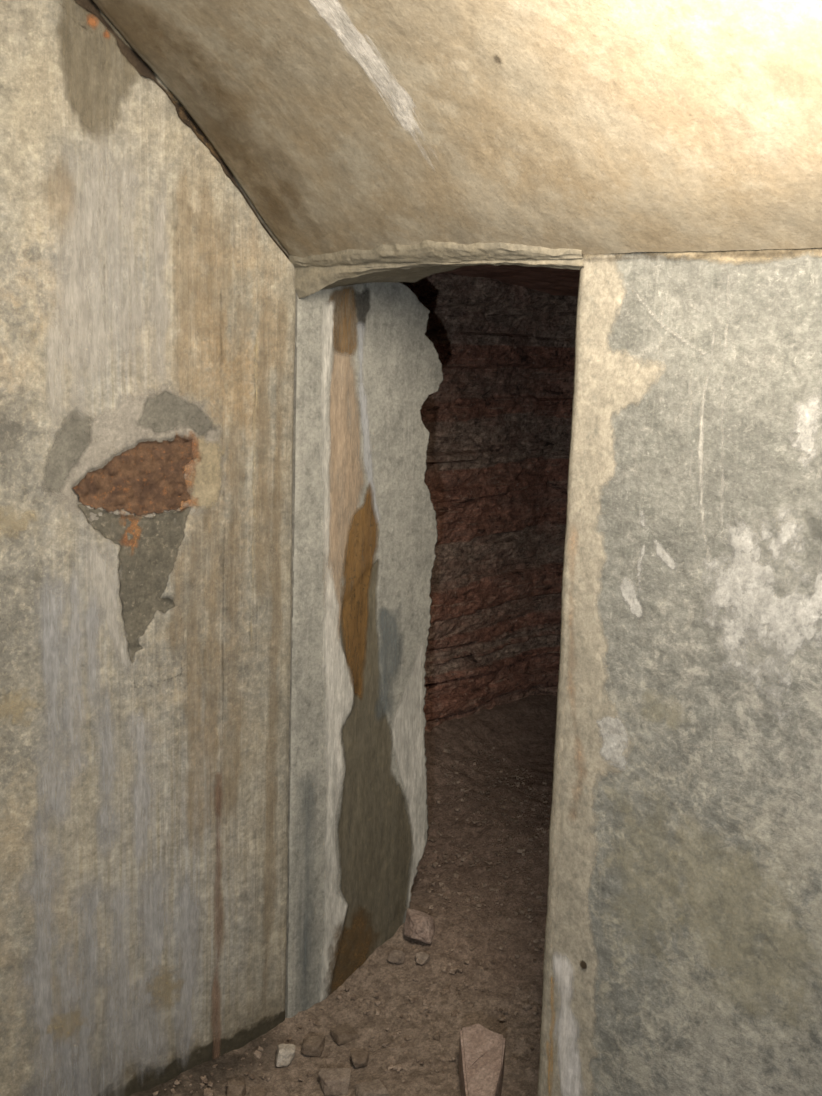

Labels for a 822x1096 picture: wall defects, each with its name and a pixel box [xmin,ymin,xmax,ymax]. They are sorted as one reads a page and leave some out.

leakage [58,0,137,135]
leakage [309,0,420,131]
spalling [44,385,223,668]
leakage [543,708,582,1096]